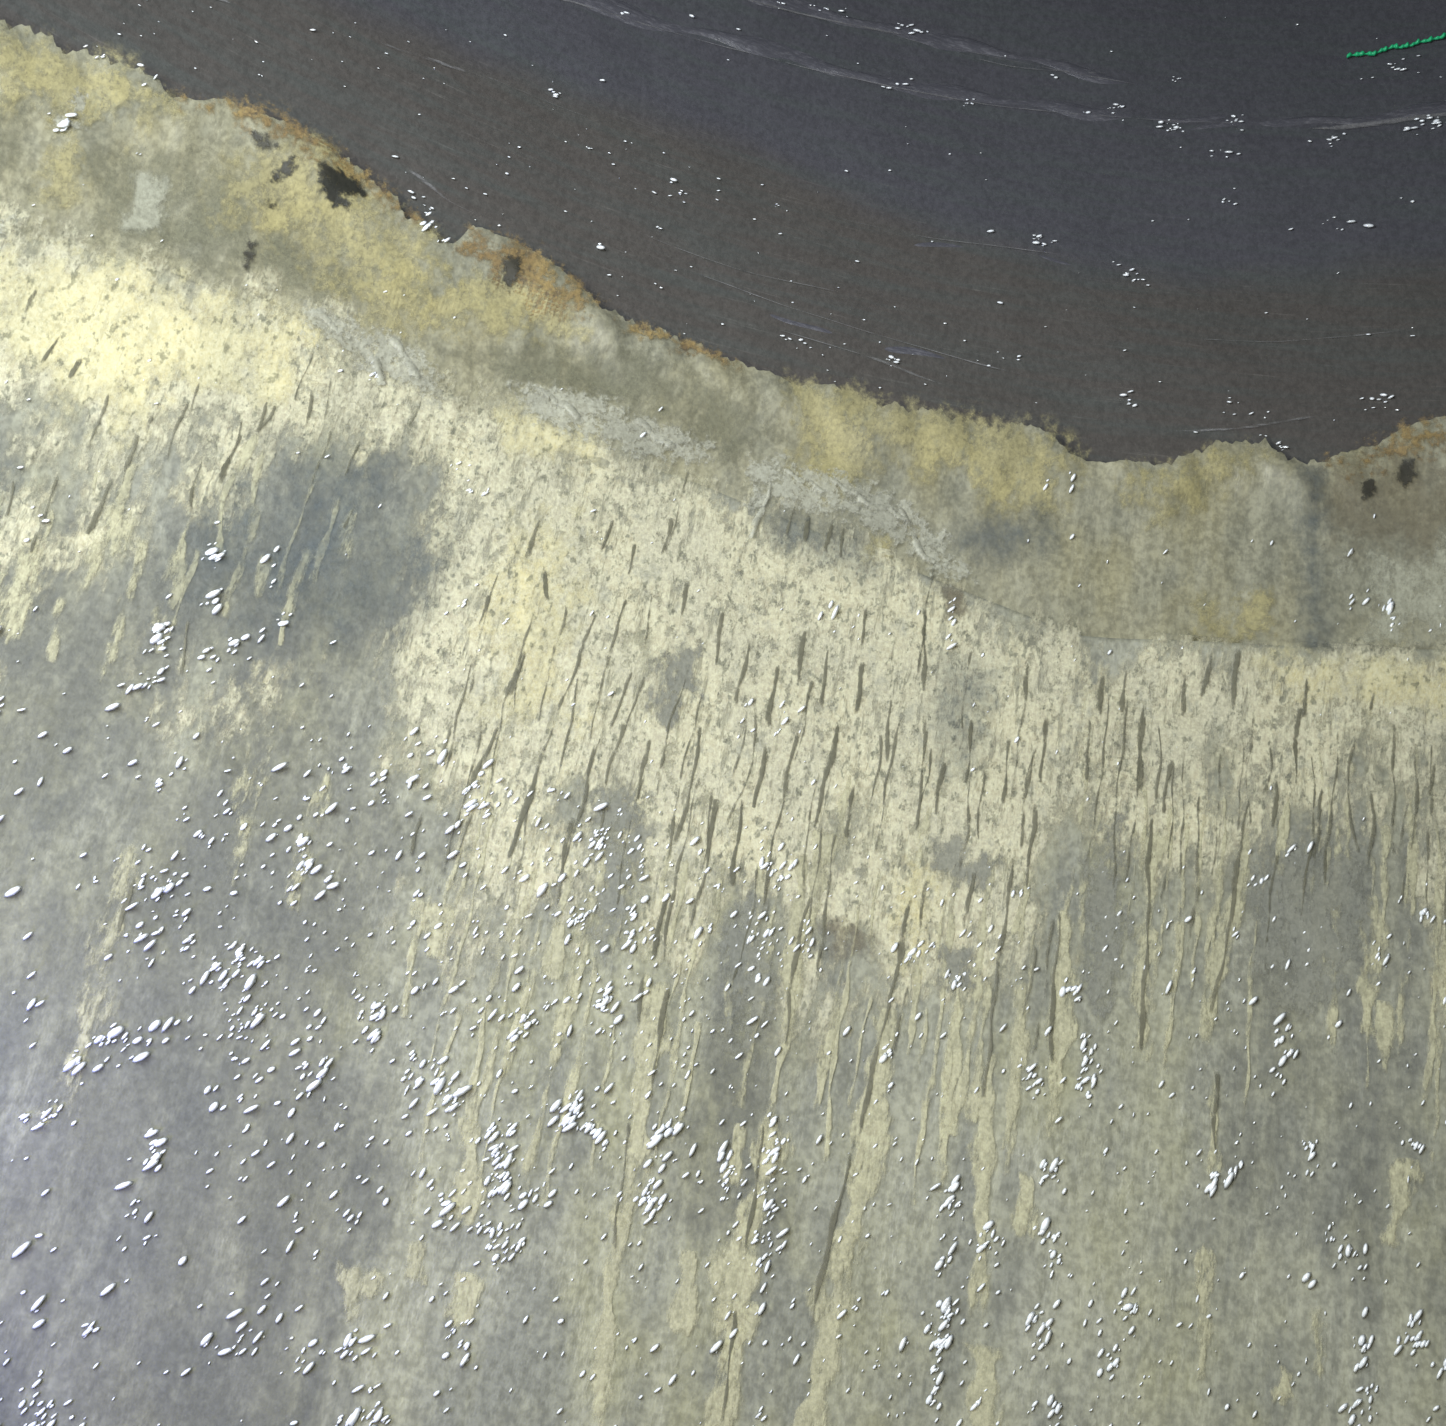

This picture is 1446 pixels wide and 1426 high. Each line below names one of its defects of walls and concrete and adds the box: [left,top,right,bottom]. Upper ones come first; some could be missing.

spalling [252,130,299,182]
rust [182,94,420,221]
spalling [317,161,367,208]
spalling [502,255,523,293]
rust [456,226,599,320]
peeling [304,303,444,405]
peeling [507,381,715,463]
leakage [791,381,1076,544]
leakage [1045,886,1078,1135]
leakage [446,969,536,1226]
leakage [705,1117,794,1426]
leakage [965,1343,1003,1426]